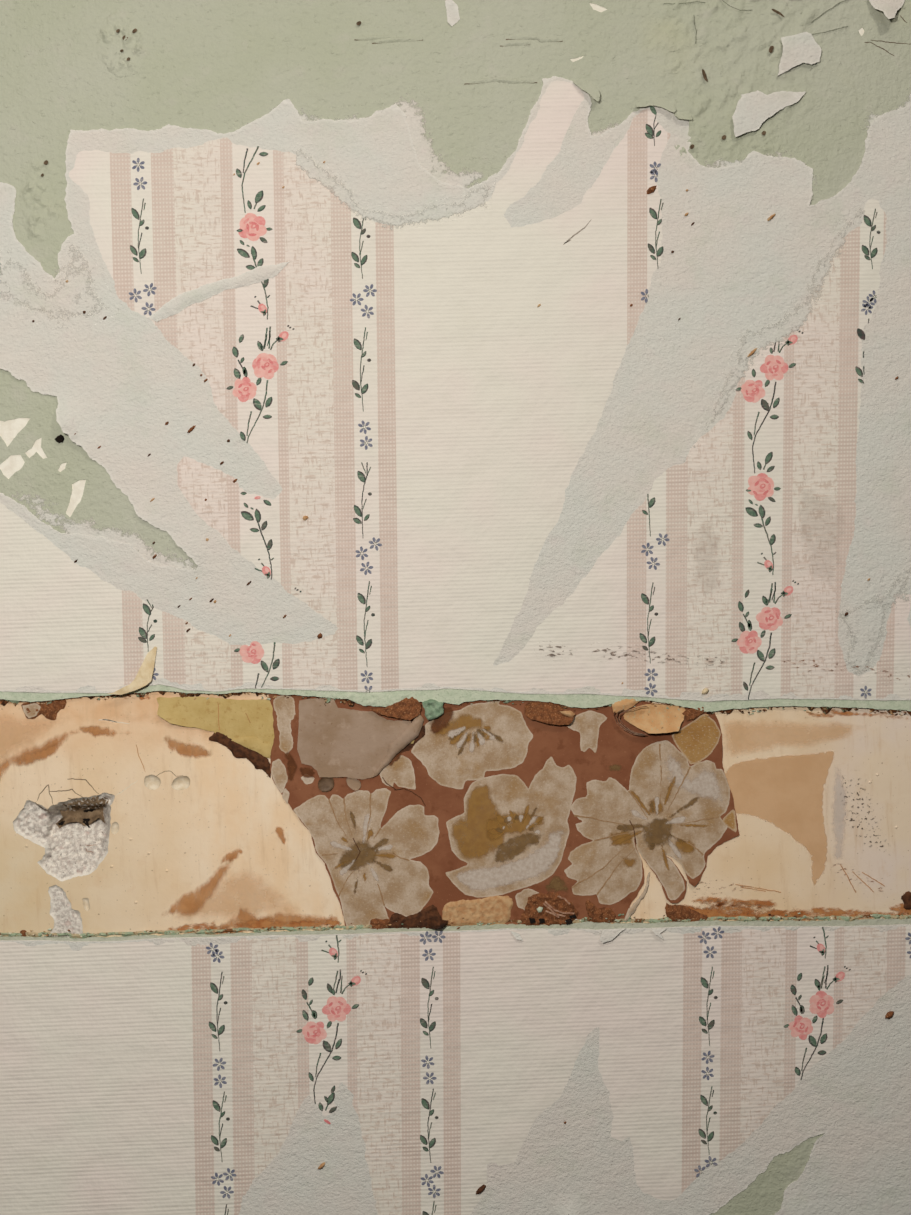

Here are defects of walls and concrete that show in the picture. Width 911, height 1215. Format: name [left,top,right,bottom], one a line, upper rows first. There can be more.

peeling [0,418,47,479]
peeling [66,480,86,517]
peeling [331,691,408,707]
leakage [0,735,65,776]
leakage [81,727,115,735]
leakage [165,738,209,757]
leakage [725,727,883,884]
spalling [13,793,115,937]
leakage [169,850,340,934]